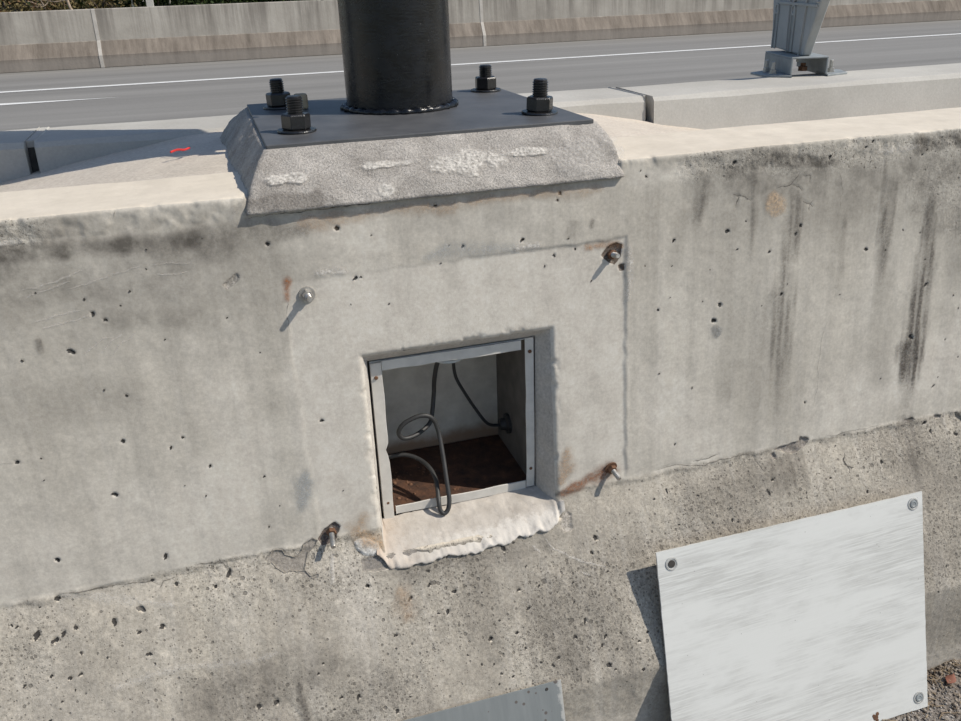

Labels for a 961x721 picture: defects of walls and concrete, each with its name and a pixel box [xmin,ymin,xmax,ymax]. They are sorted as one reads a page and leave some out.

leakage [900,211,934,380]
corrosion [559,450,609,496]